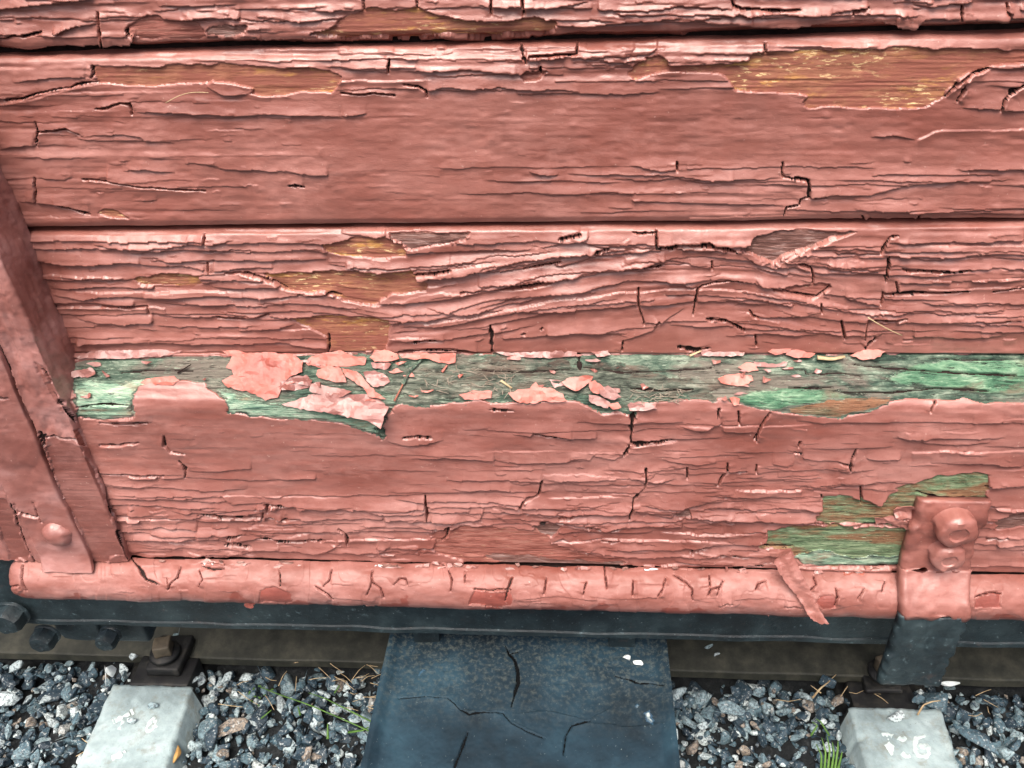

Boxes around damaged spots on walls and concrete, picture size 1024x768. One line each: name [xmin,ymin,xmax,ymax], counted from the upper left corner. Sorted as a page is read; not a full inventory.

peeling [95,63,341,102]
peeling [628,47,1024,114]
crack [781,163,816,216]
crack [633,231,757,345]
crack [782,235,1024,411]
peeling [35,226,1024,564]
crack [479,325,712,542]
crack [424,495,449,537]
peeling [755,470,990,624]
crack [367,572,408,597]
crack [448,570,513,601]
crack [583,568,726,608]